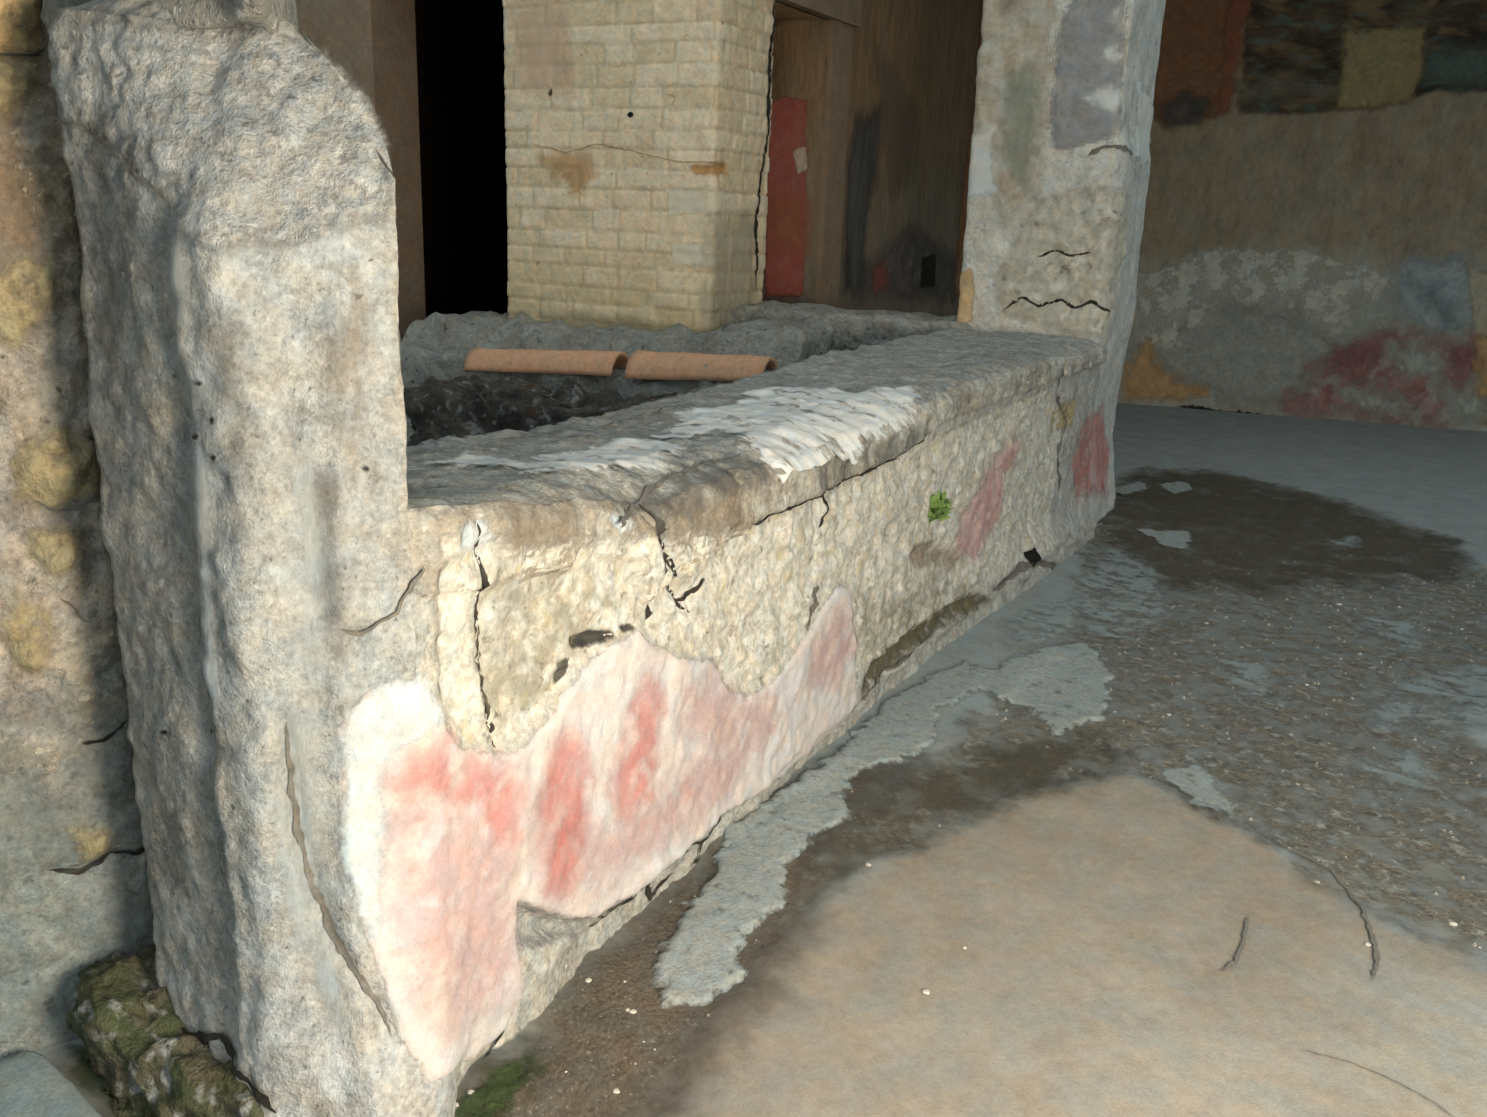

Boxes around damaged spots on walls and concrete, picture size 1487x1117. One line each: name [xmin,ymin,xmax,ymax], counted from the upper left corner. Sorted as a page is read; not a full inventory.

spalling [692,163,728,176]
crack [754,1,776,279]
flaking render [765,96,808,297]
peeling [955,0,1487,399]
crack [1003,297,1110,314]
crack [621,454,740,620]
leakage [1101,473,1462,591]
flaking render [336,386,1063,1083]
leakage [829,733,1114,874]
leakage [1218,659,1269,696]
leakage [1358,751,1439,791]
crack [181,1027,277,1113]